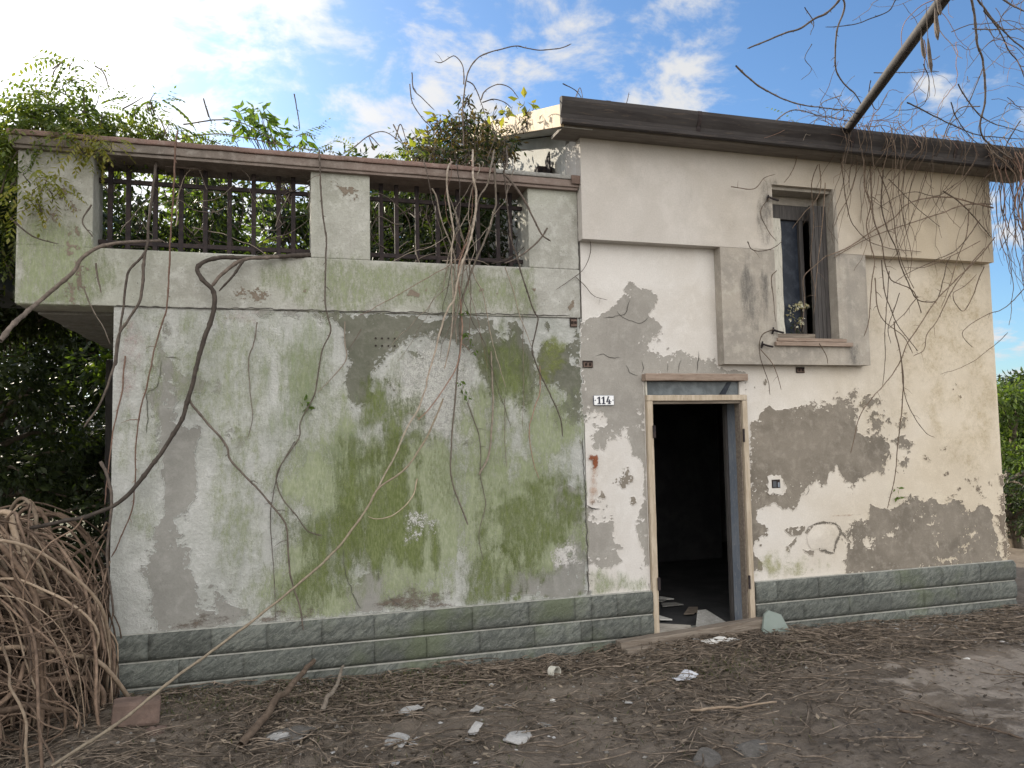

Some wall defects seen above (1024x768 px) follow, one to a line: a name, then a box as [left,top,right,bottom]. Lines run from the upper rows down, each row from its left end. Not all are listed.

peeling [139,321,250,631]
water stain [378,588,450,610]
peeling [232,281,767,600]
water stain [554,542,581,569]
peeling [749,387,915,572]
peeling [784,473,1011,574]